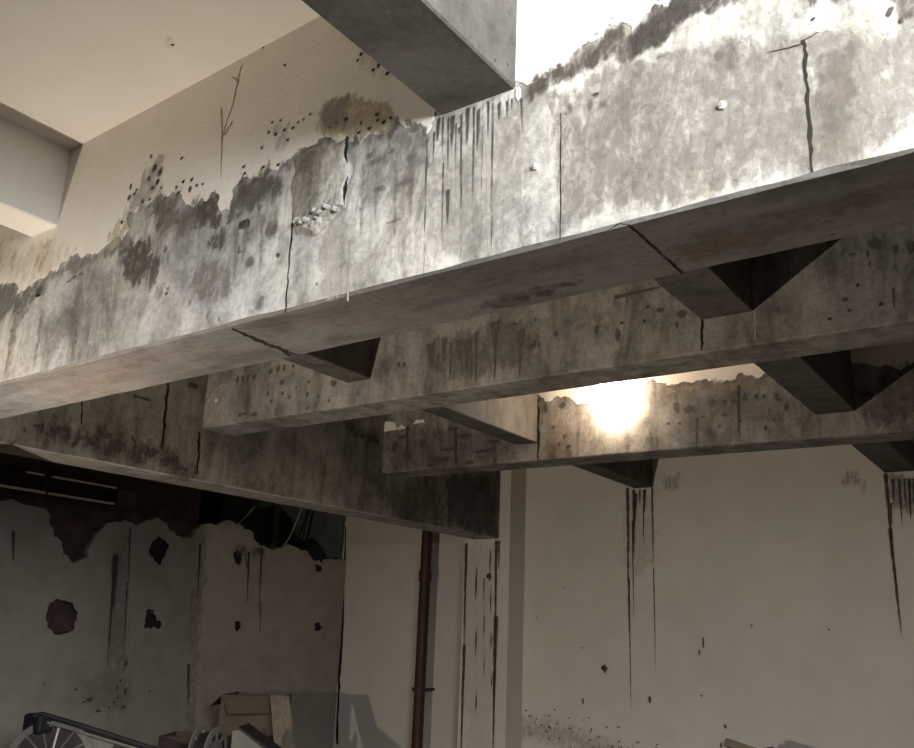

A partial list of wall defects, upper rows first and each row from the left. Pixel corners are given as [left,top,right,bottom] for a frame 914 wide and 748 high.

water stain [886,0,914,23]
spalling [0,117,426,322]
crack [285,214,293,313]
water stain [425,98,523,223]
crack [767,31,820,172]
crack [232,329,301,356]
crack [161,383,169,448]
hole [46,599,78,635]
spalling [148,537,169,565]
water stain [426,427,508,748]
water stain [626,487,654,699]
water stain [883,473,914,631]